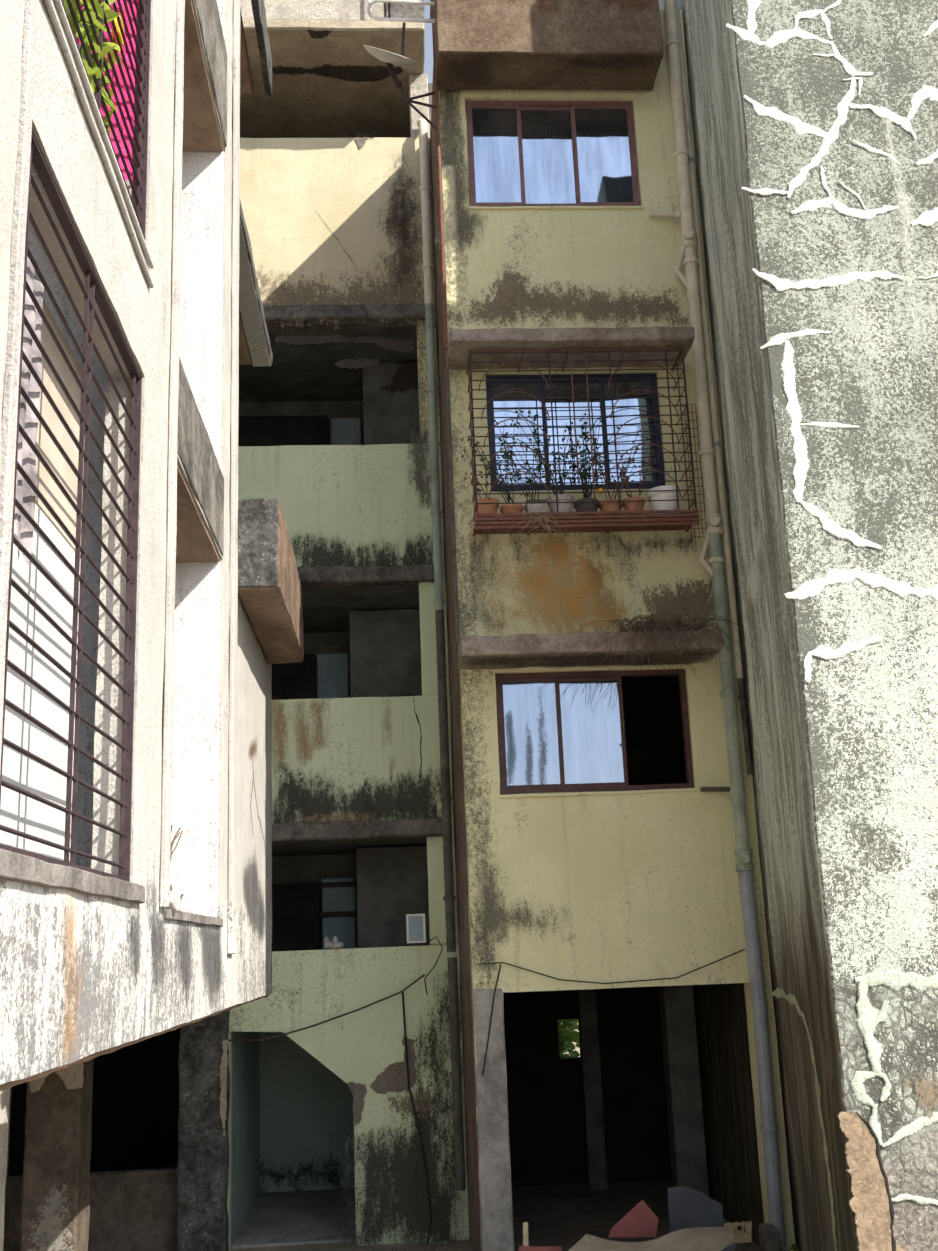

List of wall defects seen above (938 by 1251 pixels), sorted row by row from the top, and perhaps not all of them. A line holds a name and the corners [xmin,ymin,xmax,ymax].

crack [726,0,938,226]
damp [256,57,493,329]
damp [447,265,688,328]
crack [752,268,938,291]
crack [760,329,938,600]
damp [293,535,434,567]
damp [272,765,442,824]
damp [132,903,223,1009]
peeling [29,1062,84,1093]
mould [260,971,468,1247]
peeling [348,1037,418,1127]
spalling [838,1112,907,1251]